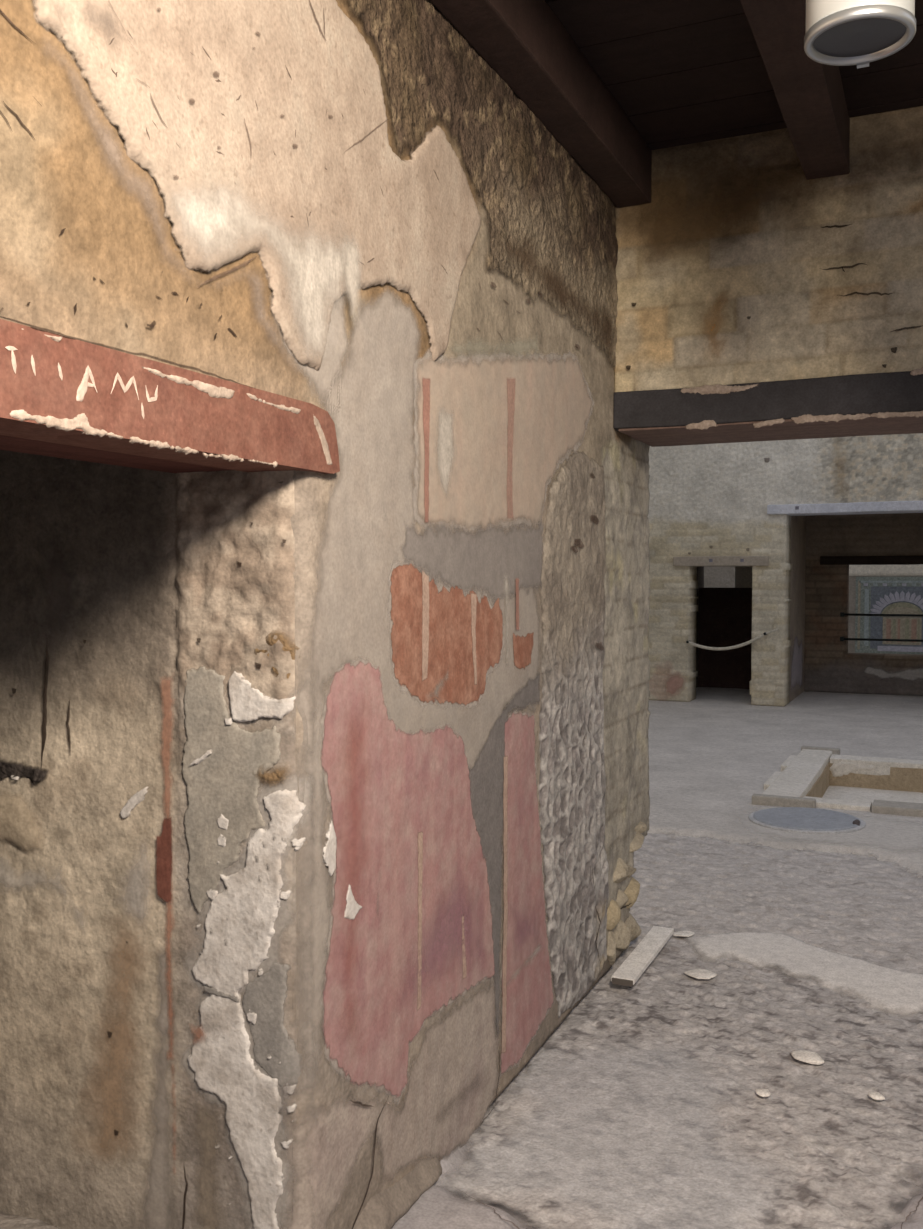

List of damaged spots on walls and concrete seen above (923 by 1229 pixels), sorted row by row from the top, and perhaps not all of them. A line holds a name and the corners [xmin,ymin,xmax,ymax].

flaking render [34,0,636,410]
peeling [9,409,278,468]
peeling [143,367,332,465]
peeling [686,420,716,430]
peeling [681,384,758,395]
peeling [753,411,923,428]
flaking render [255,633,297,679]
crack [41,637,71,768]
flaking render [225,671,296,725]
flaking render [182,768,499,1229]
crack [480,1042,500,1126]